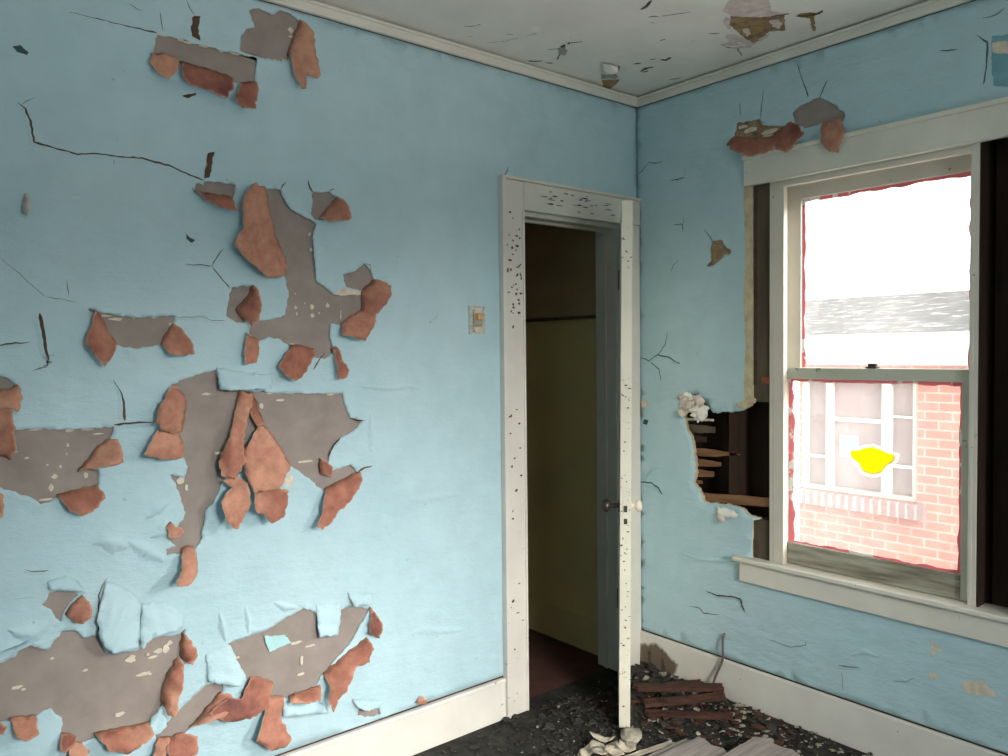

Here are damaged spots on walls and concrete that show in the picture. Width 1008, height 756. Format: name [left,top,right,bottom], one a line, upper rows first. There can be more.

peeling [150,9,321,109]
peeling [710,0,823,56]
crack [15,98,204,185]
peeling [726,64,846,157]
peeling [82,308,195,367]
peeling [144,152,392,587]
crack [640,332,680,379]
spalling [678,186,770,539]
peeling [0,376,124,518]
crack [691,592,745,615]
peeling [0,575,385,756]